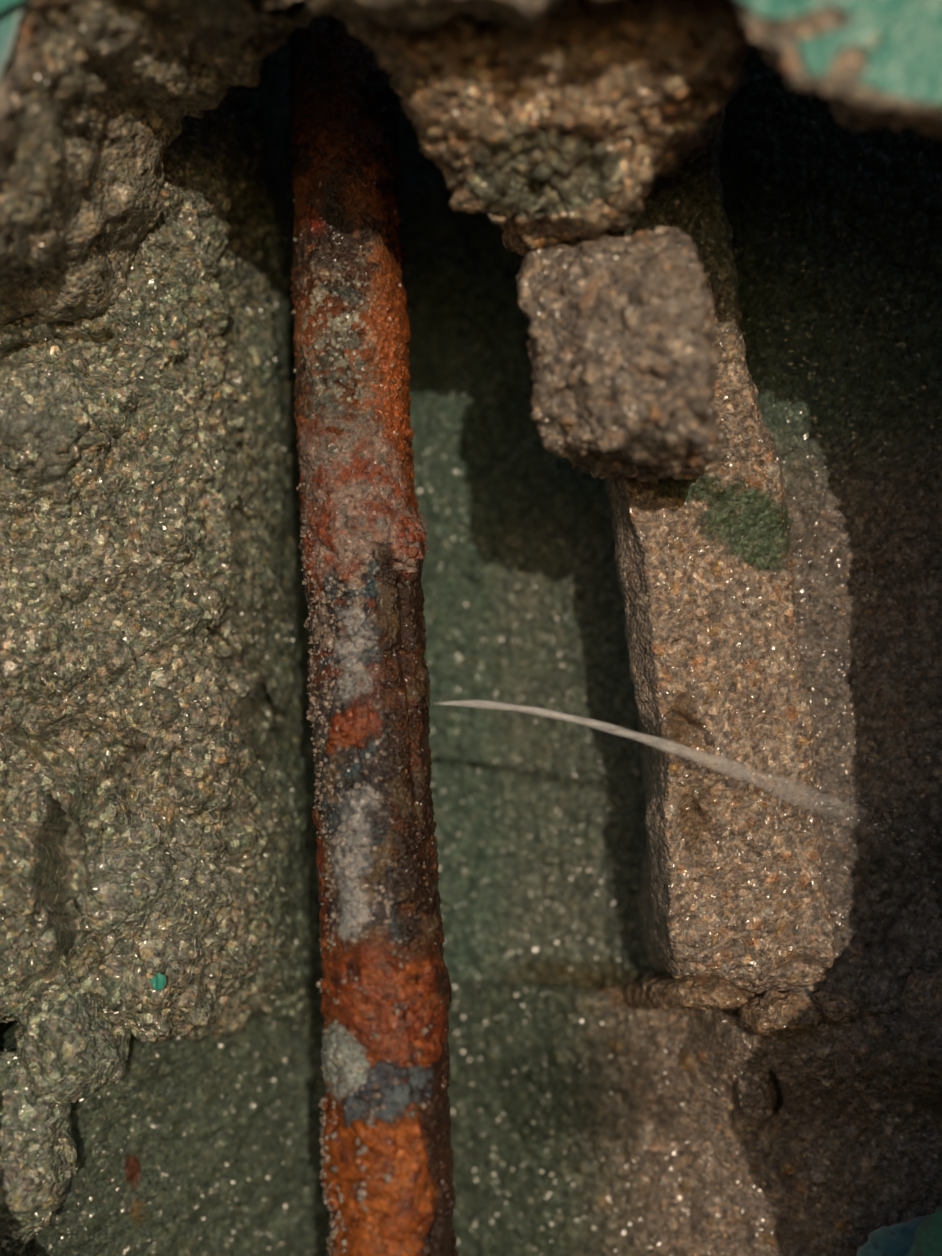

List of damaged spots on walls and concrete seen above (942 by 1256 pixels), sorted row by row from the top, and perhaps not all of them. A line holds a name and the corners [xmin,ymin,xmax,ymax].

spalling [0,0,942,993]
peeling [856,1207,942,1256]